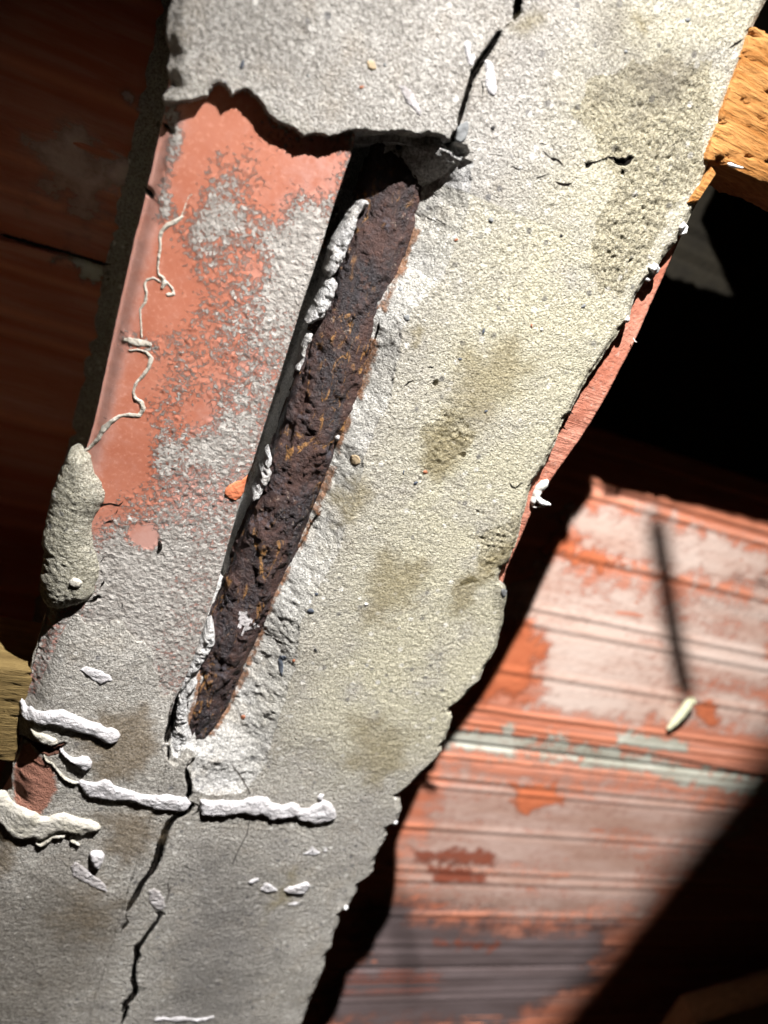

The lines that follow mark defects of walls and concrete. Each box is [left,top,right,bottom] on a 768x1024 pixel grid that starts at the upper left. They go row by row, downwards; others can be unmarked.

spalling [171,83,302,137]
crack [446,0,523,145]
rust [321,207,338,251]
rust [377,227,420,312]
rust [357,338,378,399]
spalling [170,130,476,795]
rust [298,465,337,549]
crack [121,689,200,1024]